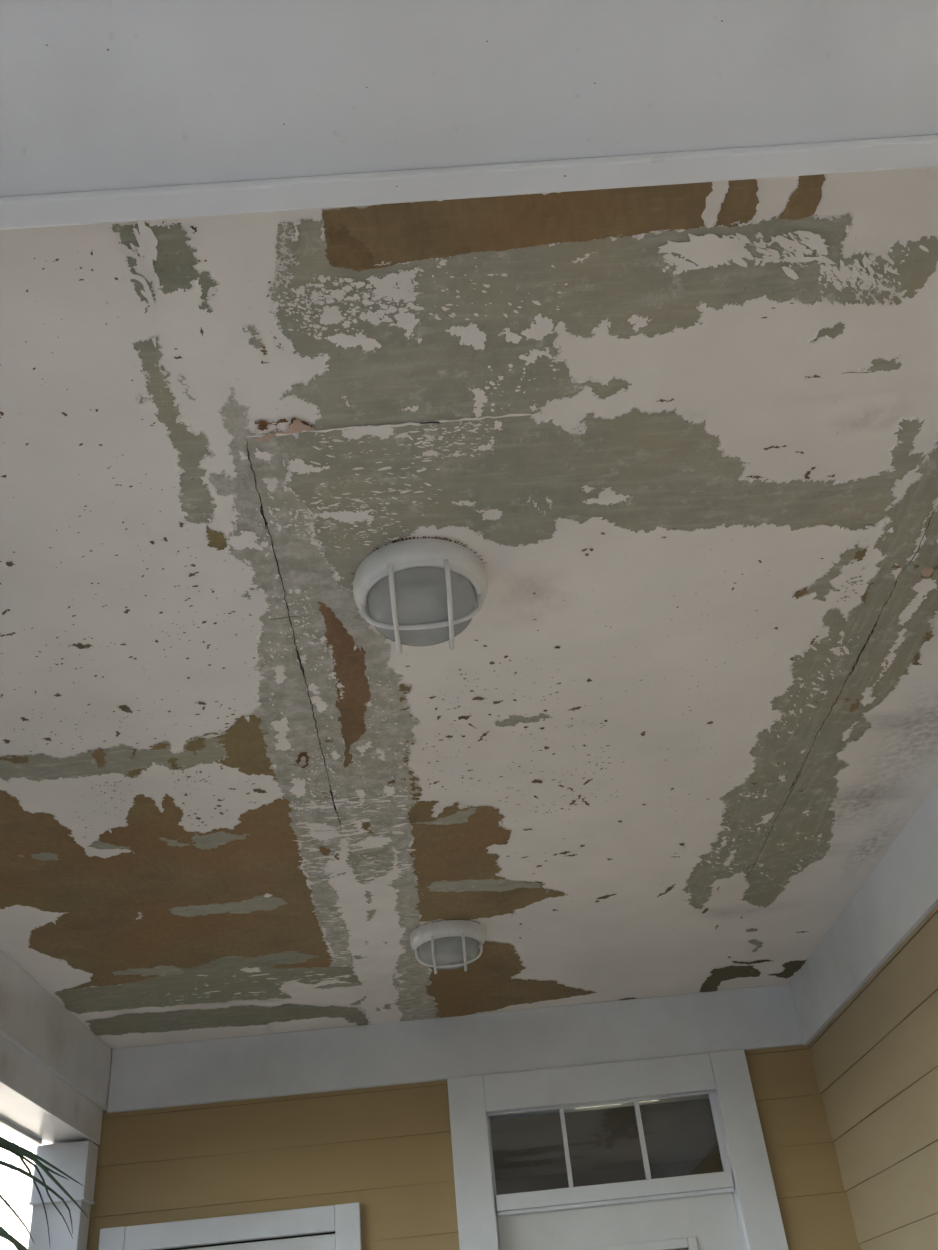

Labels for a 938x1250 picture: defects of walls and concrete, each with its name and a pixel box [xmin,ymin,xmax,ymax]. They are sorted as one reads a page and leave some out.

crack [246,439,394,831]
peeling [3,212,938,1025]
crack [747,506,938,878]